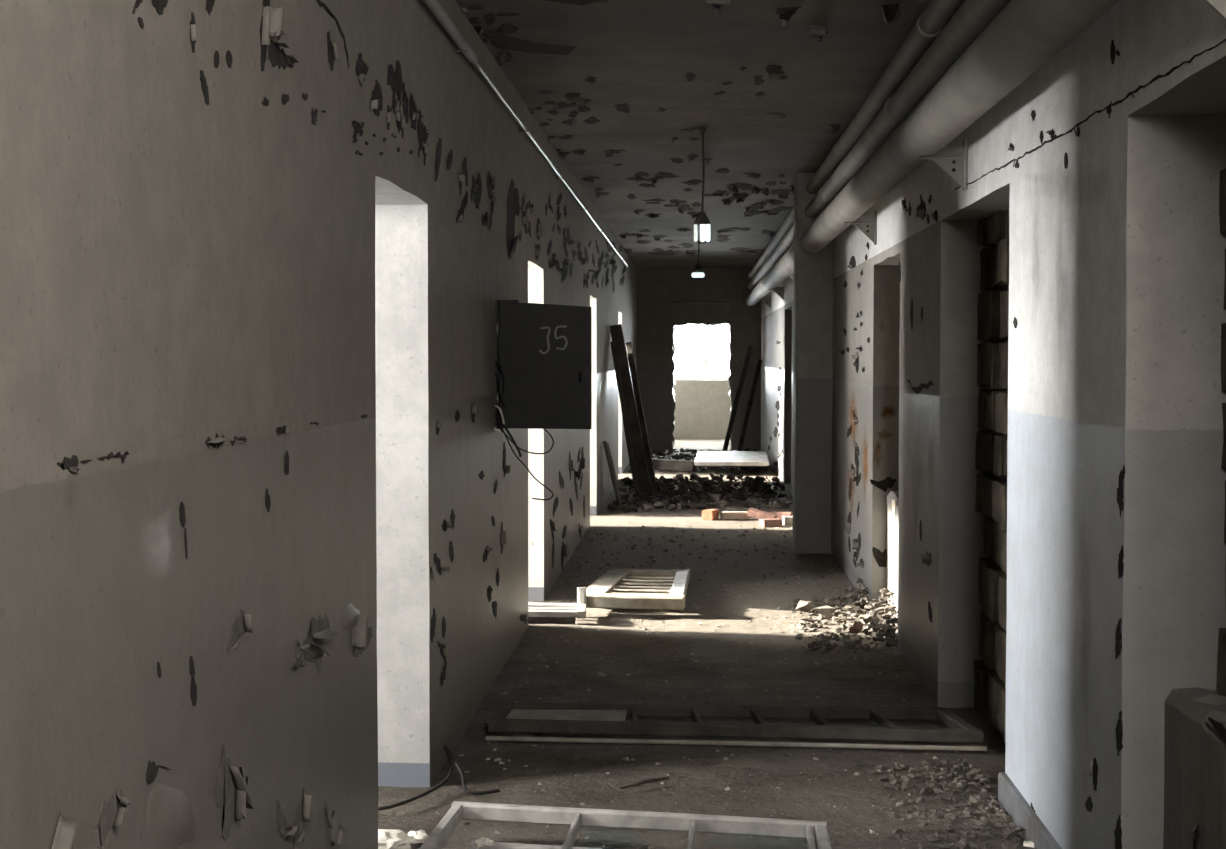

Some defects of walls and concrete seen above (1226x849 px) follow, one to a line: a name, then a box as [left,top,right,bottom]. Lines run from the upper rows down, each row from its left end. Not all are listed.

peeling [132,0,168,28]
peeling [260,0,300,72]
peeling [200,50,233,105]
crack [954,38,1226,190]
peeling [352,52,794,294]
peeling [844,242,869,289]
peeling [838,310,870,373]
peeling [430,509,455,580]
peeling [483,516,506,618]
peeling [550,447,585,570]
peeling [845,410,897,568]
peeling [430,608,447,686]